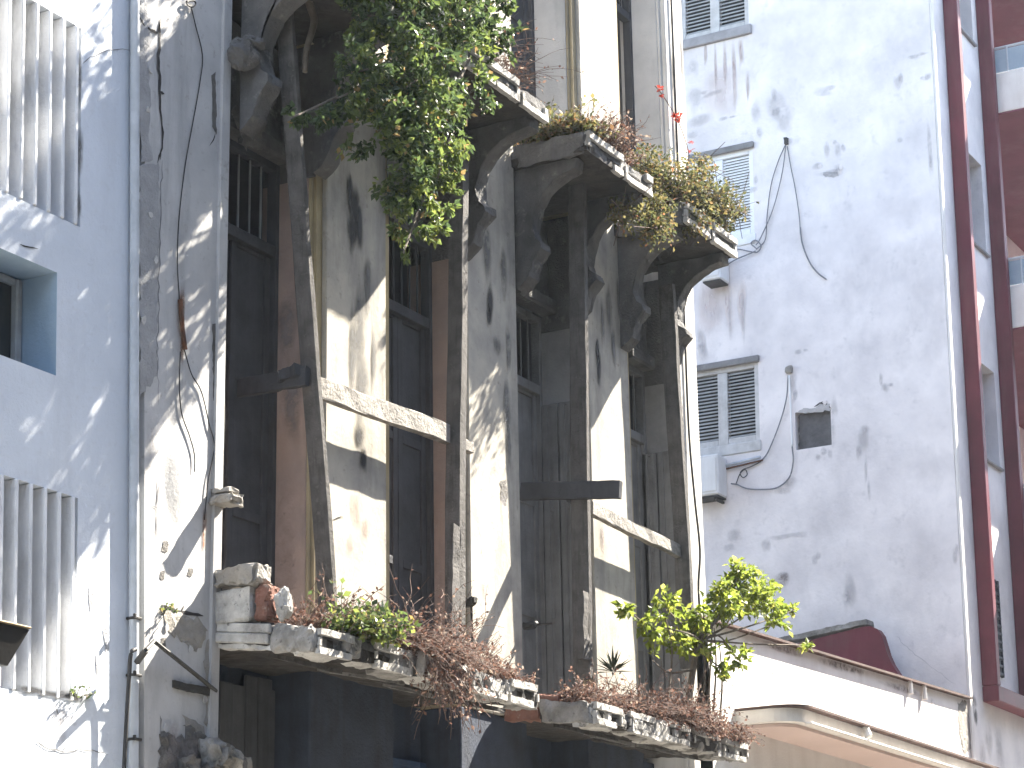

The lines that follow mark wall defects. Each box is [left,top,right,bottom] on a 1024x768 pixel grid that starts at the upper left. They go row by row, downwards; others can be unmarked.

peeling [139,2,160,398]
crack [140,18,164,405]
water stain [348,177,362,247]
spalling [161,606,210,681]